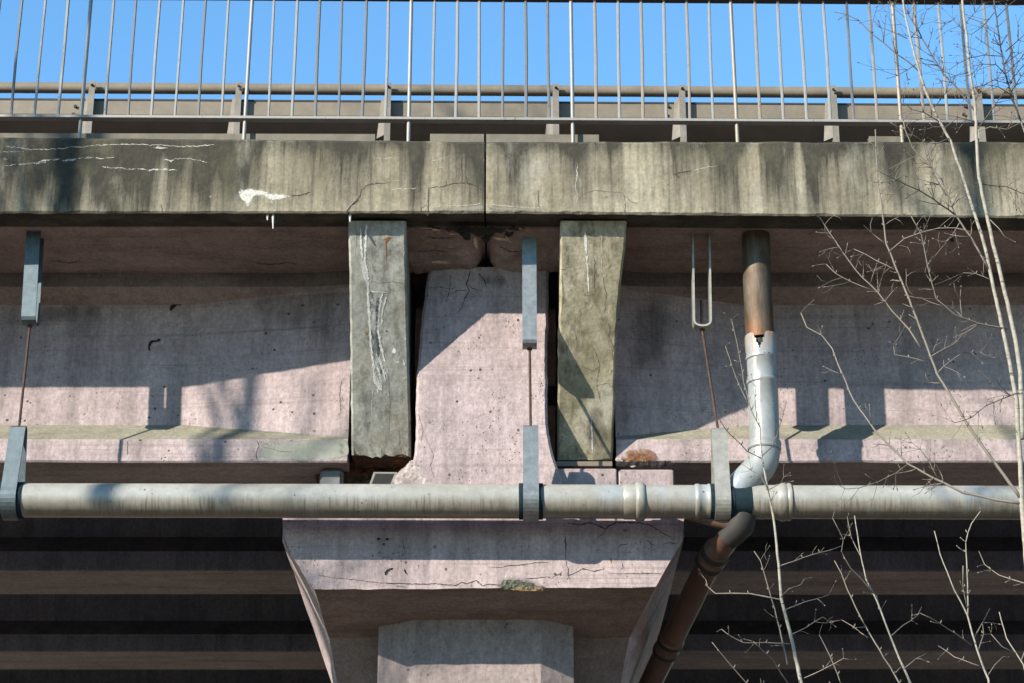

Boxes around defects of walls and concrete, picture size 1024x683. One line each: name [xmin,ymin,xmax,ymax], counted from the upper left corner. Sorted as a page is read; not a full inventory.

efflorescence [239,189,309,206]
crack [346,157,484,216]
crack [430,271,486,311]
leakage [354,224,387,418]
spalling [344,457,428,484]
crack [319,521,676,587]